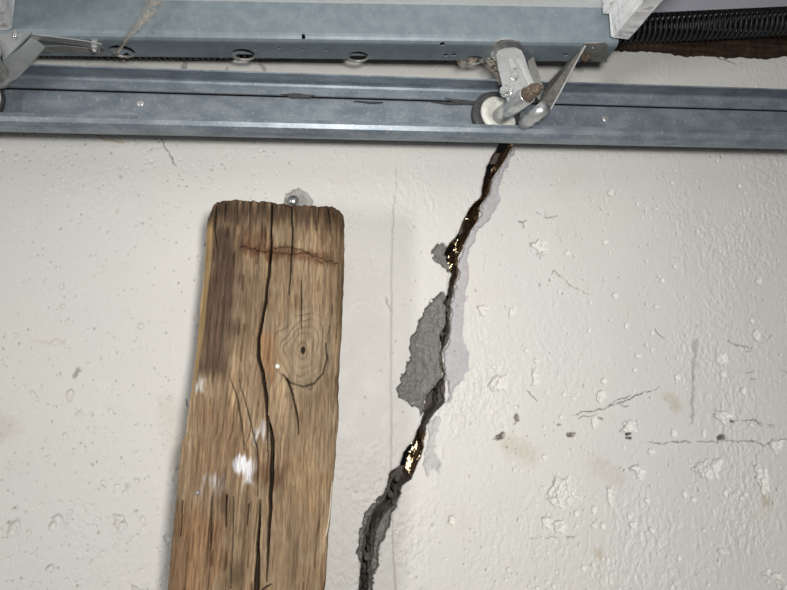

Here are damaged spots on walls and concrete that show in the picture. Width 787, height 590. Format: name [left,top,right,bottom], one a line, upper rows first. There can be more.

spalling [396,146,518,479]
crack [358,143,514,590]
crack [569,385,662,421]
crack [628,418,787,448]
peeling [539,454,607,536]